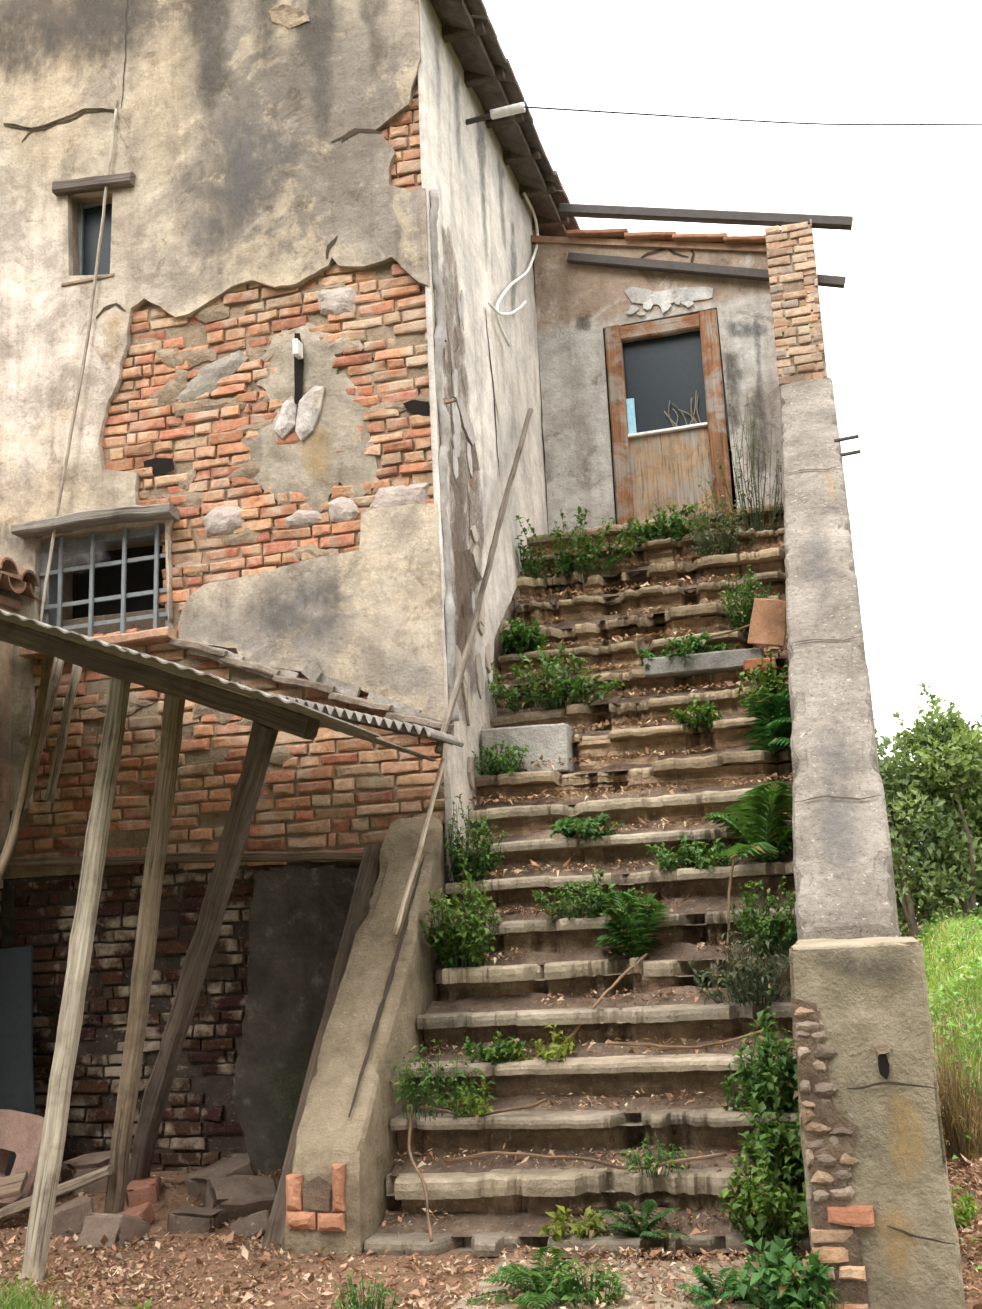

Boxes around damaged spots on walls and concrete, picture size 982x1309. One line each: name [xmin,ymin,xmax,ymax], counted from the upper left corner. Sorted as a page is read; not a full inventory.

crack [3,0,128,142]
damp [0,0,138,68]
damp [191,0,229,104]
damp [301,0,334,68]
crack [331,128,382,143]
spalling [341,82,422,189]
peeling [624,287,713,316]
spalling [15,658,110,858]
spalling [85,228,505,1172]
spalling [13,880,80,1117]
spalling [62,847,147,1162]
spalling [791,997,875,1309]